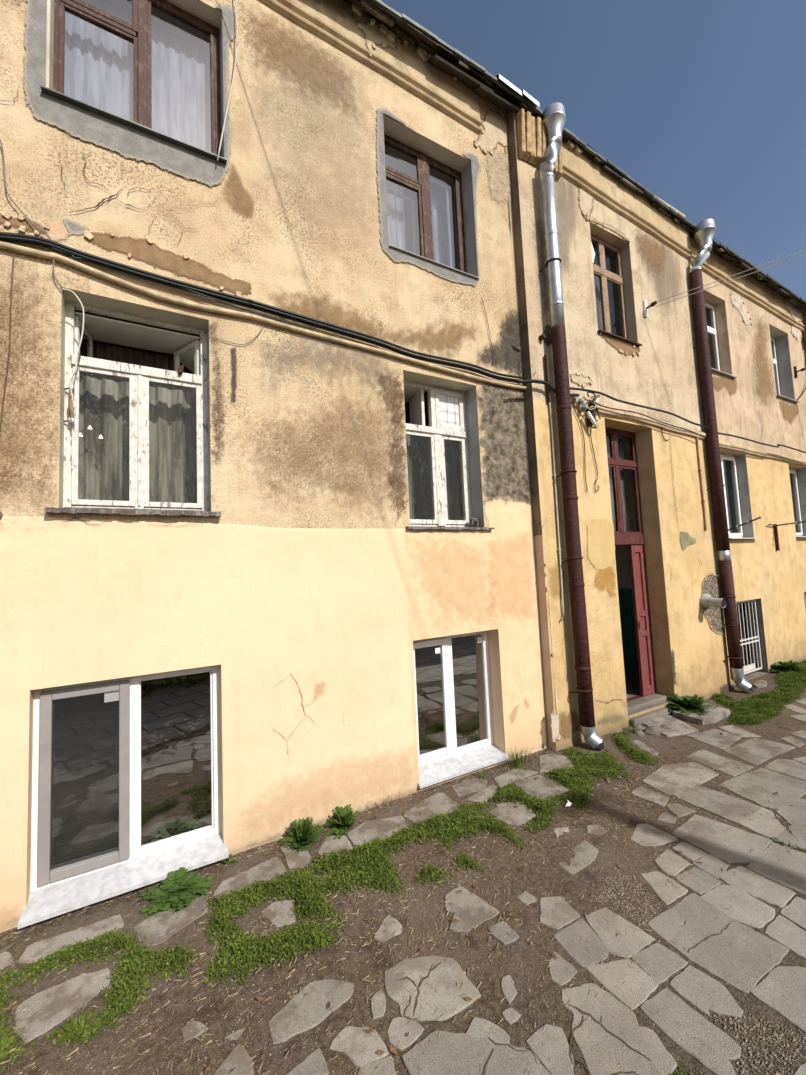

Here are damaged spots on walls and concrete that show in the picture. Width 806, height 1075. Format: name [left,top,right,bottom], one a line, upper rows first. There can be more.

crack [61,152,219,246]
flaking render [0,209,252,297]
leakage [477,311,532,504]
flaking render [680,532,696,551]
flaking render [702,573,725,636]
crack [271,673,318,758]